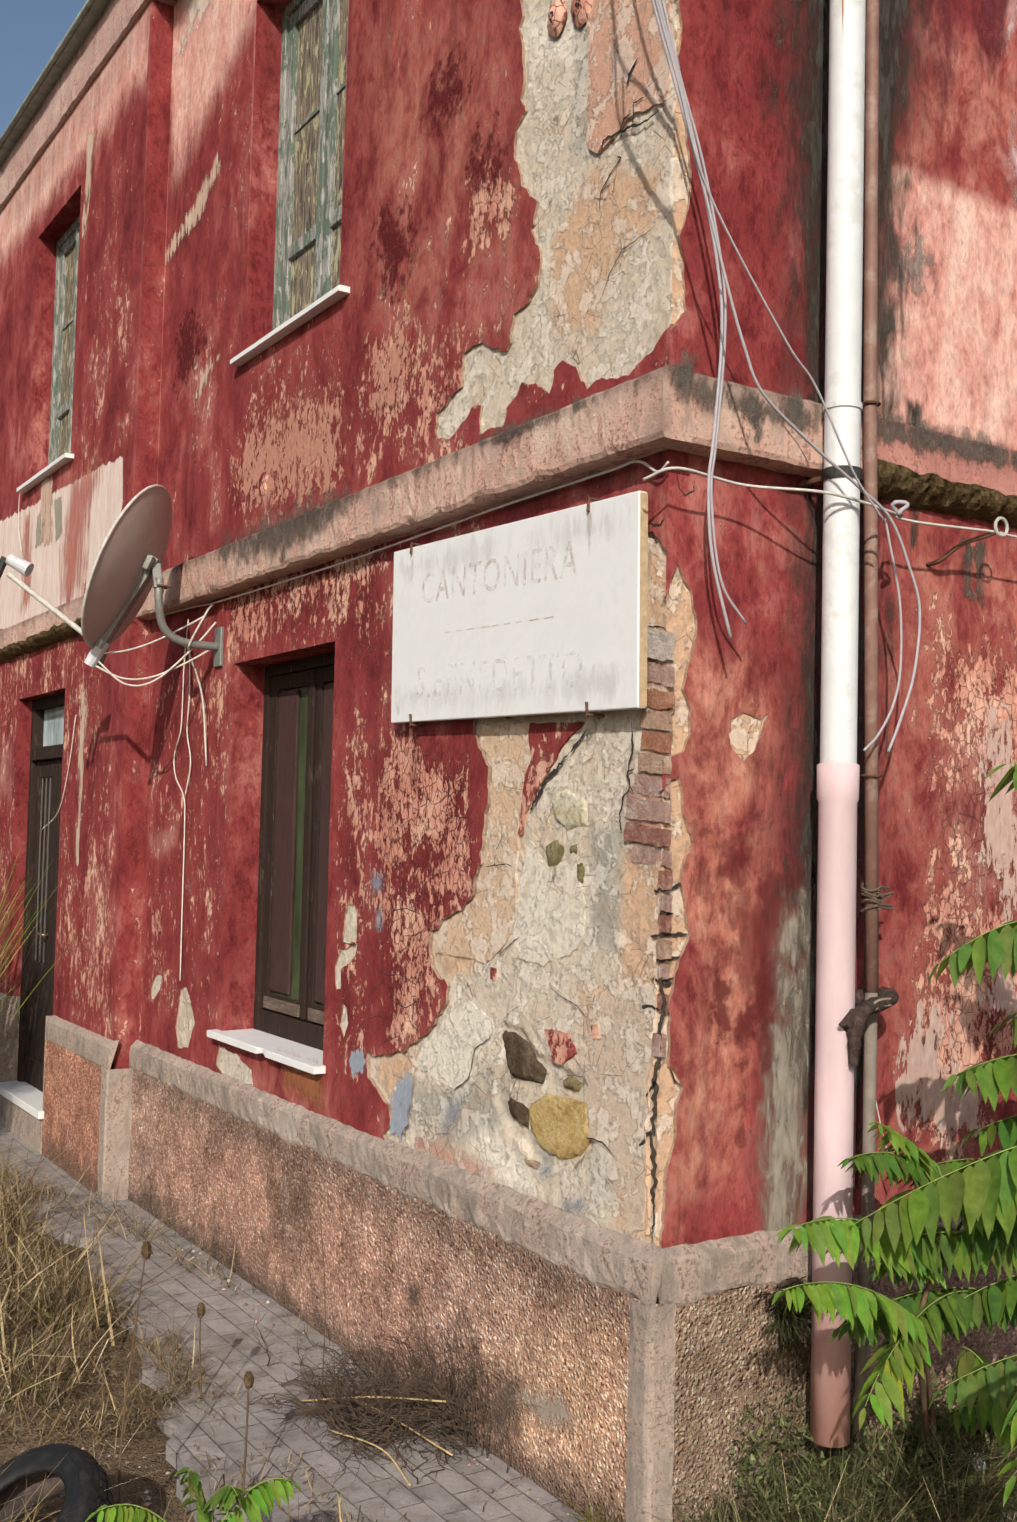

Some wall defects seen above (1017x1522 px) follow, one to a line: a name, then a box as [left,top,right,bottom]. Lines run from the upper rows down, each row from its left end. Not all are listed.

spalling [435,0,692,439]
damp [770,0,830,404]
damp [861,0,1017,469]
peeling [228,307,423,527]
spalling [366,532,697,1248]
crack [587,883,688,1242]
peeling [893,995,983,1151]
peeling [974,699,1017,923]
peeling [978,963,1017,1034]